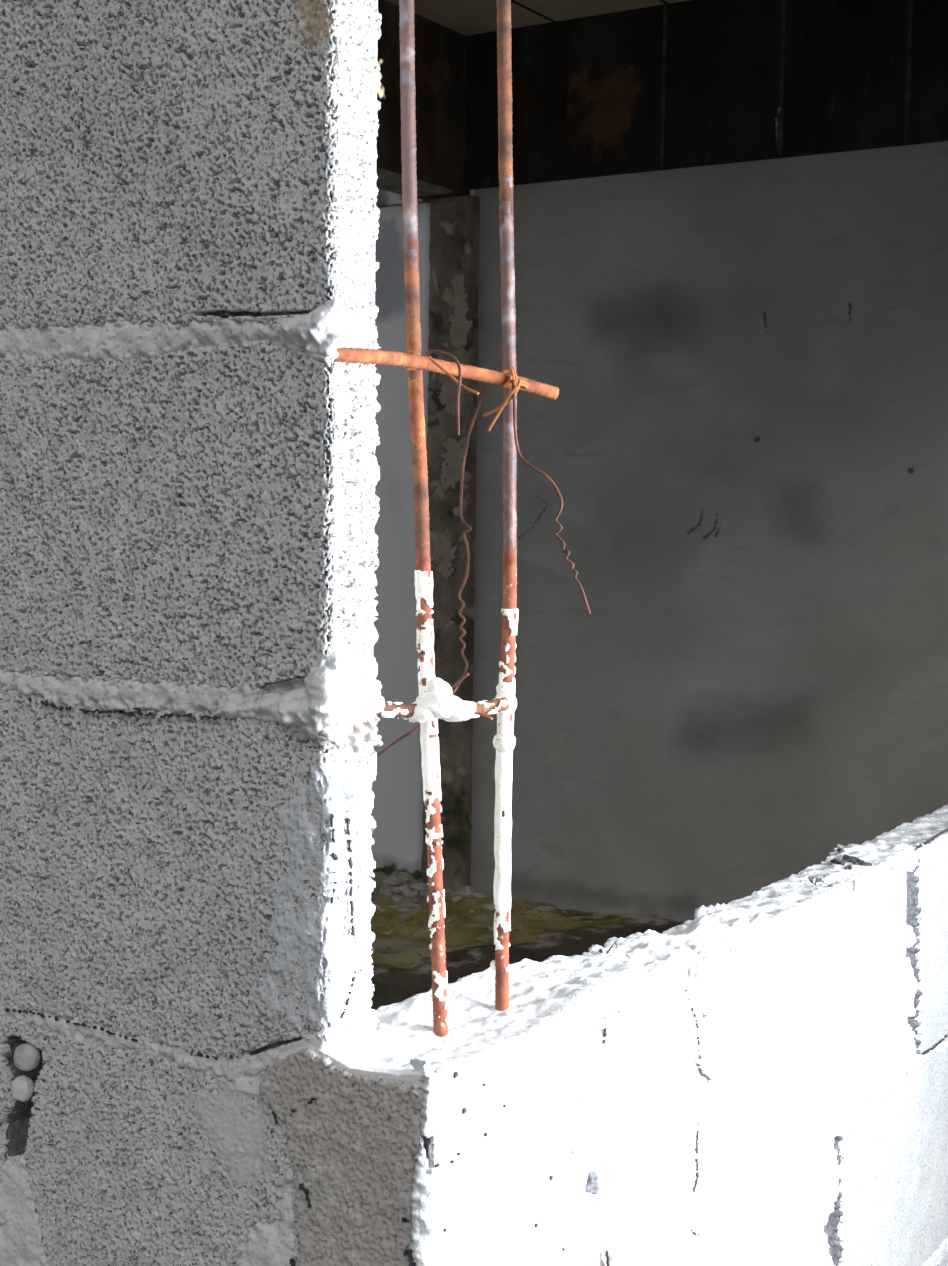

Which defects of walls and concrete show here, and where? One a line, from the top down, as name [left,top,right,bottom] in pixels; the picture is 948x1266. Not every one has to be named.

damp [375,221,404,314]